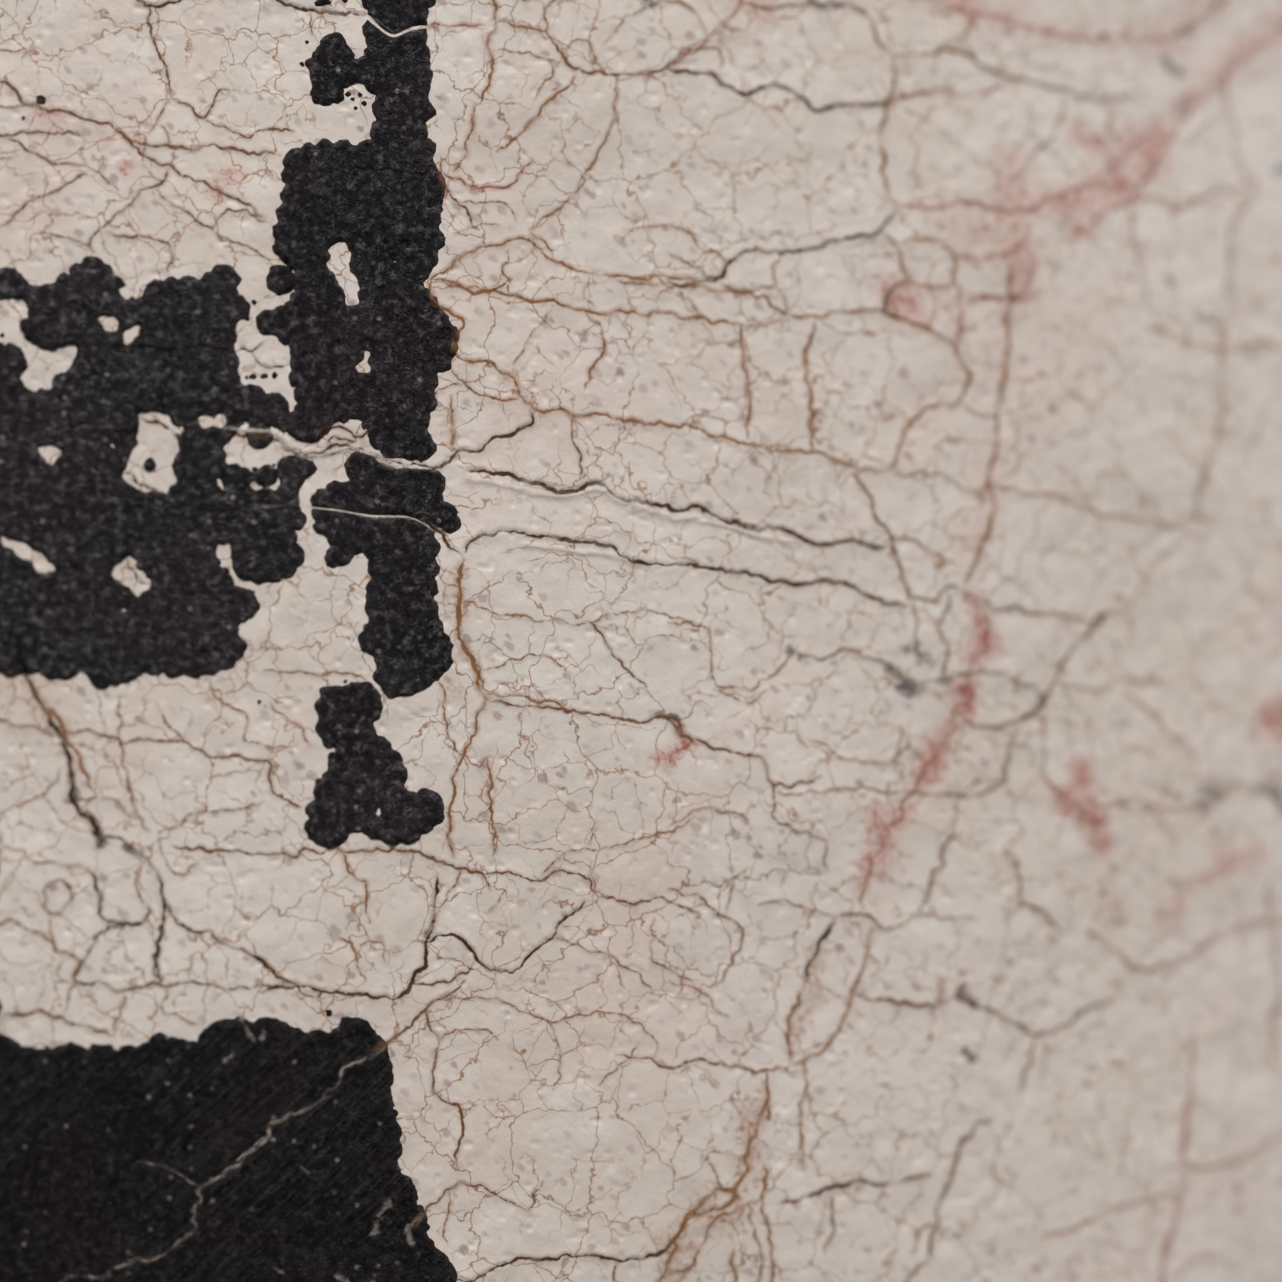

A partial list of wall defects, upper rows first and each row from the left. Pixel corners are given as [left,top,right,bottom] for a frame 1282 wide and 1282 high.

crack [0,0,292,269]
crack [127,472,160,493]
crack [50,343,284,433]
peeling [0,0,461,849]
crack [226,0,1190,865]
peeling [0,1010,458,1282]
crack [0,633,990,1282]
crack [956,996,1099,1090]
crack [1005,841,1056,926]